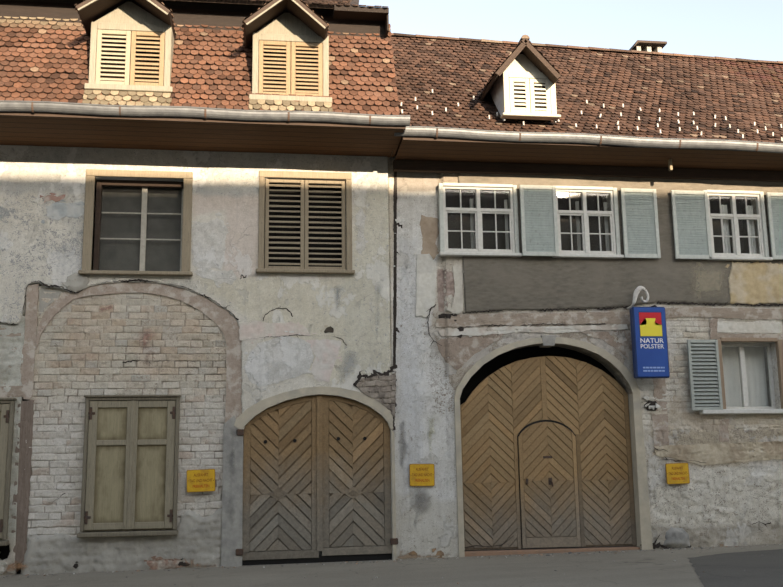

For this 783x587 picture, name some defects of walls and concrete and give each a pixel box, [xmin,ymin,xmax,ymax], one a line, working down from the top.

crack [0,279,240,325]
crack [254,306,347,346]
flaking render [413,253,436,318]
crack [426,304,442,346]
flaking render [437,264,628,338]
flaking render [239,320,342,390]
spalling [356,372,396,417]